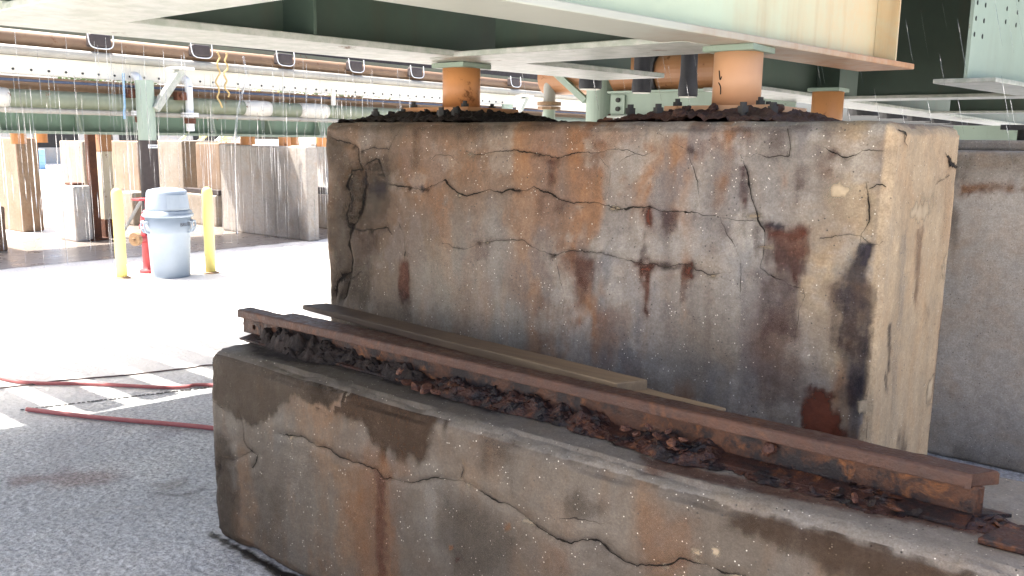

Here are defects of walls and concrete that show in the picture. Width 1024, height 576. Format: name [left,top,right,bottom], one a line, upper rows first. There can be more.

corrosion [398,261,410,303]
crack [333,128,805,323]
corrosion [635,261,655,315]
corrosion [683,262,694,279]
corrosion [766,223,809,284]
crack [822,184,886,245]
leakage [837,243,873,406]
leakage [20,346,448,462]
corrosion [801,386,847,437]
crack [216,406,258,490]
crack [280,433,744,576]
crack [209,532,298,576]